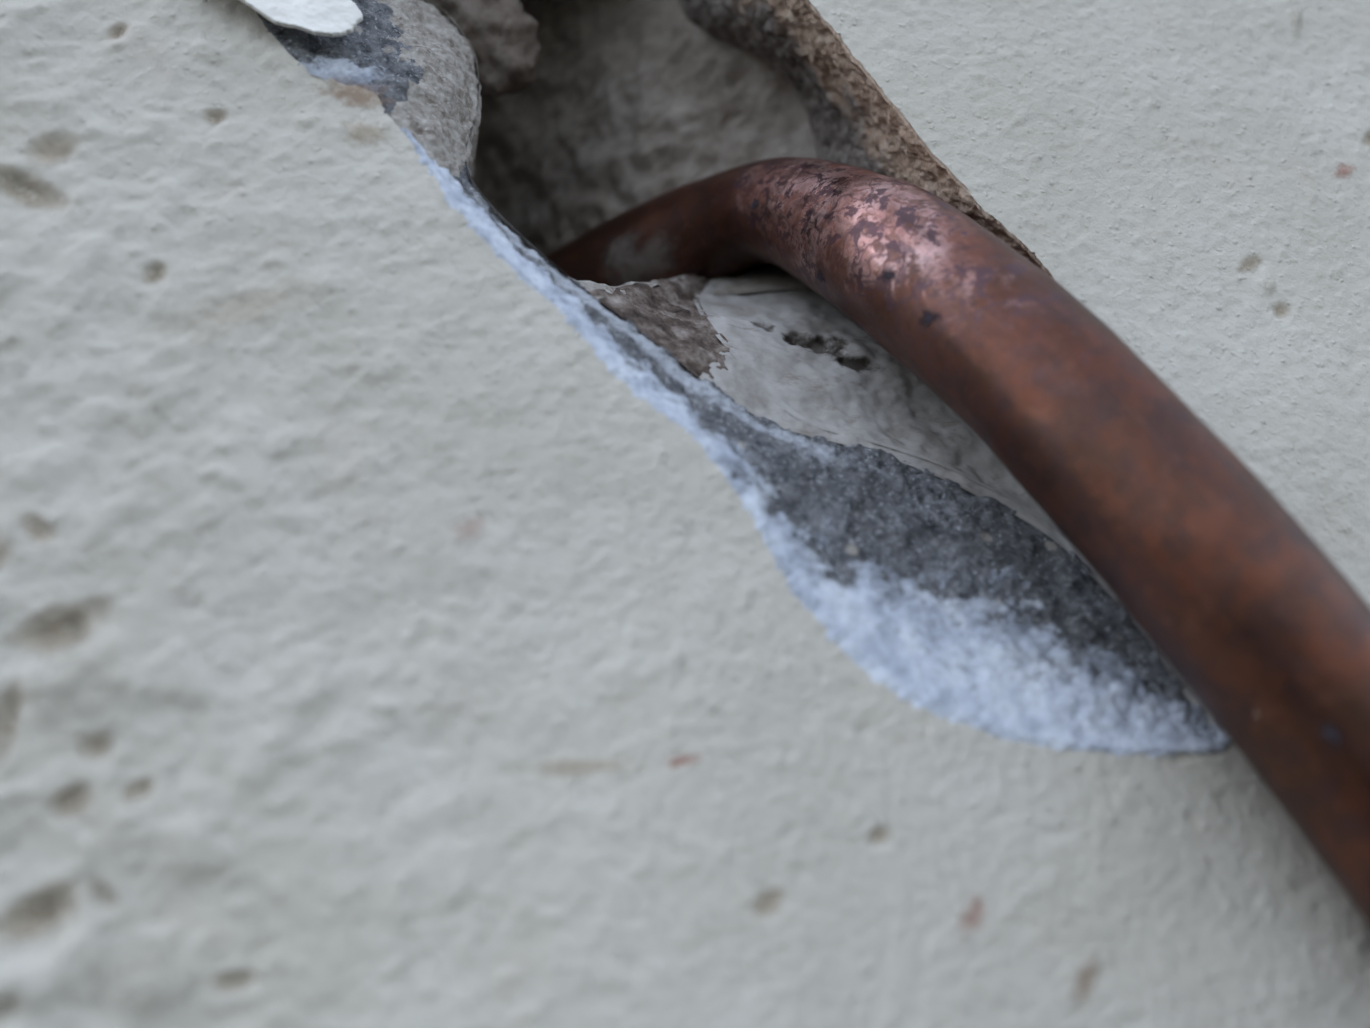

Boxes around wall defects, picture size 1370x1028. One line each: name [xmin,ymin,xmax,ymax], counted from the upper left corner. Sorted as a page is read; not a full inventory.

spalling [240,0,1232,758]